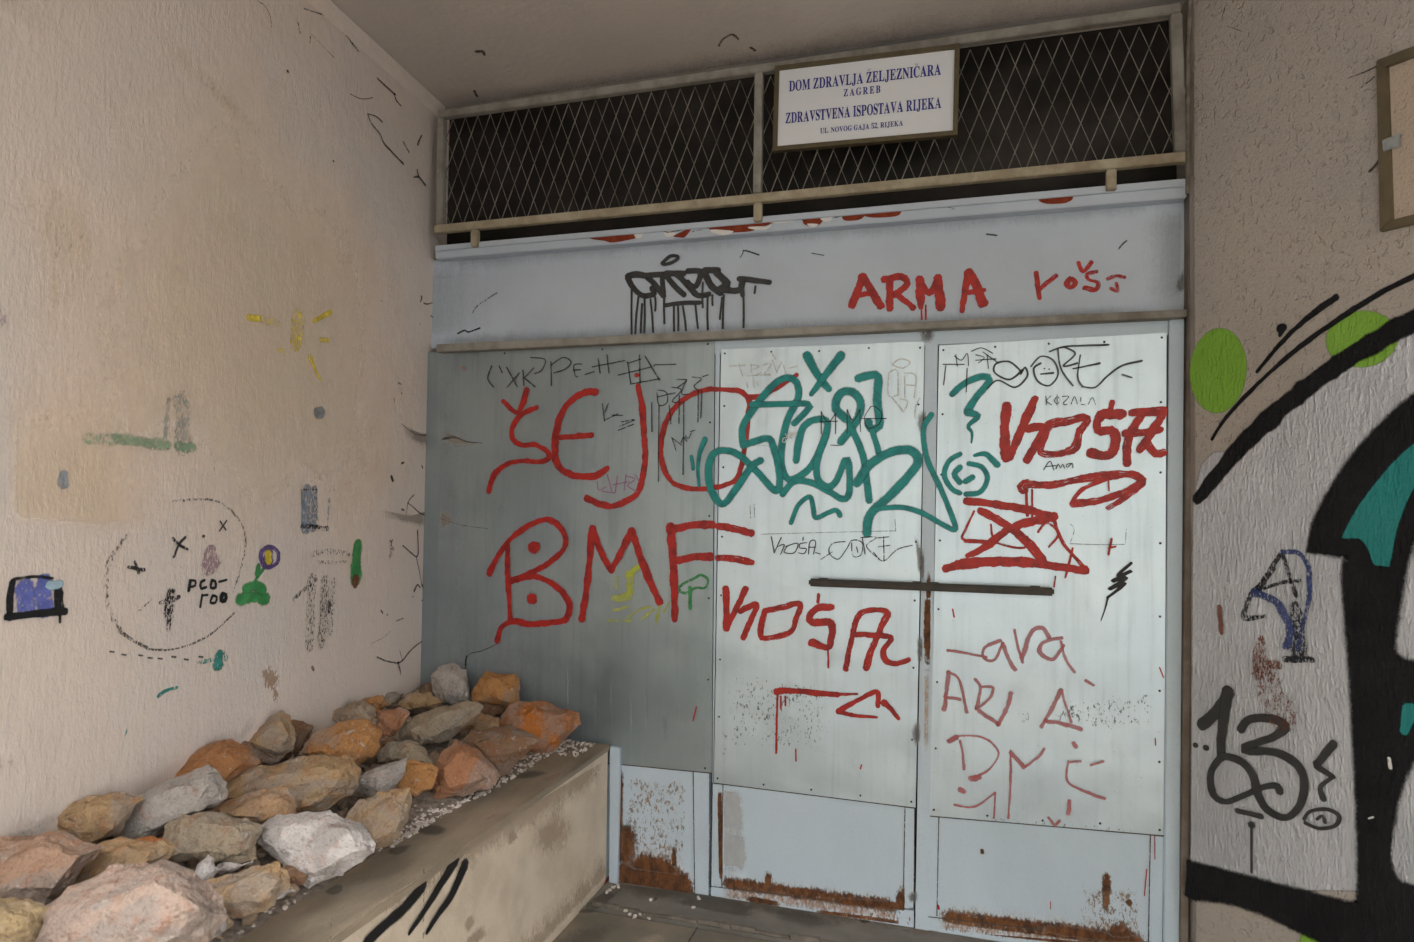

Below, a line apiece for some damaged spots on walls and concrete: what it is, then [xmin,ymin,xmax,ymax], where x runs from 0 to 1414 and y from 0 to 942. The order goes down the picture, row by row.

corrosion [619,772,694,893]
corrosion [717,793,910,924]
corrosion [941,872,1144,942]